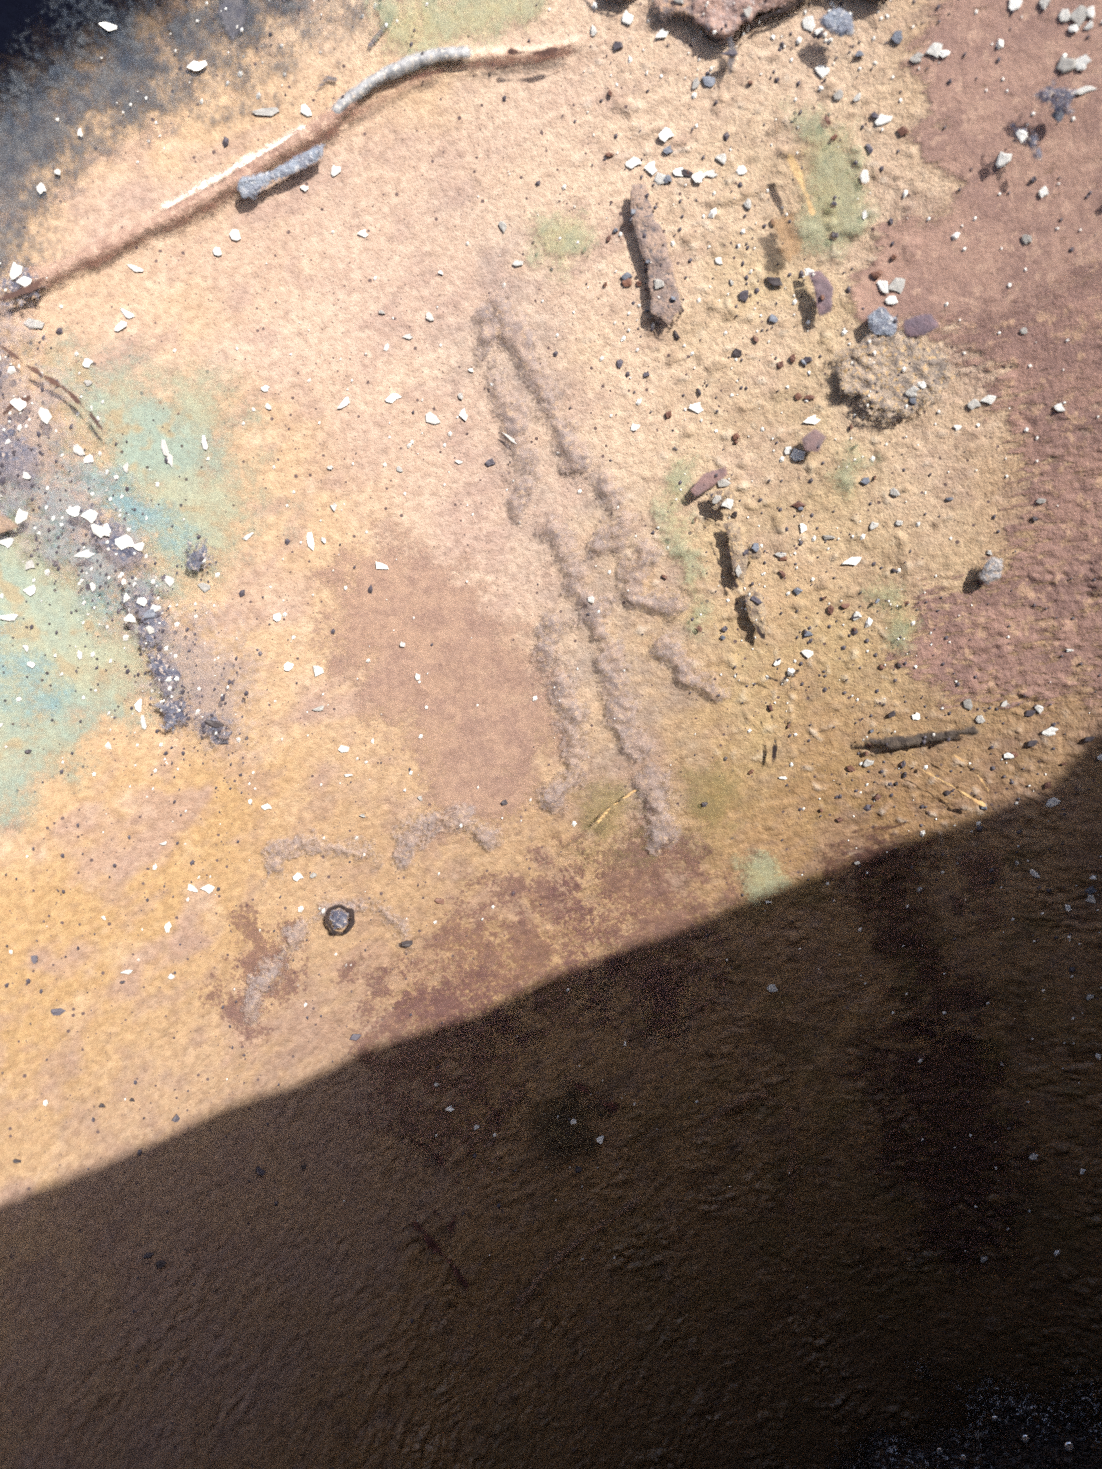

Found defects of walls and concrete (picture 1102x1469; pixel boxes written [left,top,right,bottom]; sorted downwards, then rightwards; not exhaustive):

corrosion [649,0,804,87]
corrosion [663,169,693,183]
corrosion [604,183,683,338]
corrosion [767,277,783,286]
corrosion [771,214,802,262]
corrosion [777,354,812,368]
corrosion [849,0,1102,786]
corrosion [822,596,861,631]
corrosion [820,809,1038,1284]